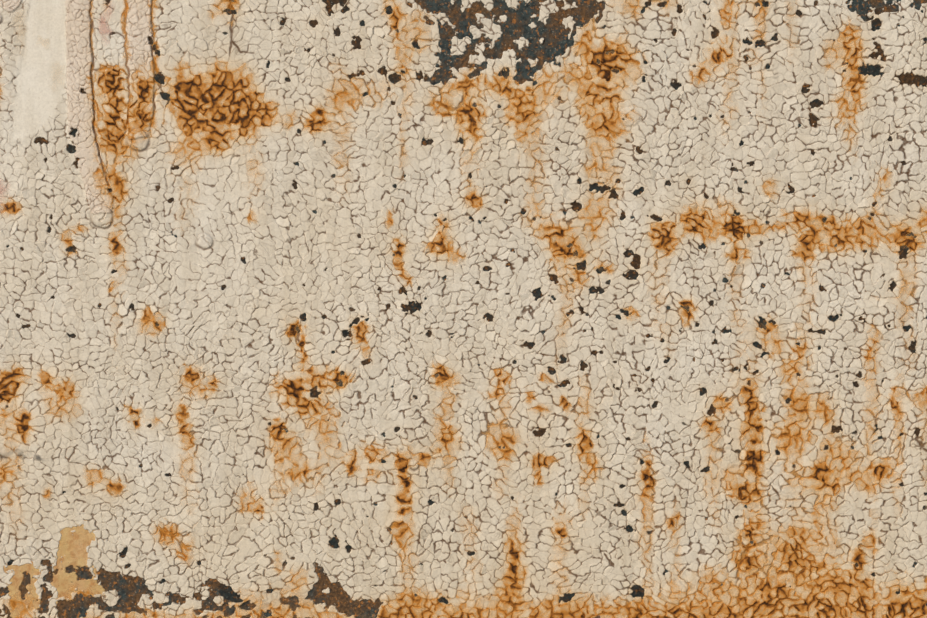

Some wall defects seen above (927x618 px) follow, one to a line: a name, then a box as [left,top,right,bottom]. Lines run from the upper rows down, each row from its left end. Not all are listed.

crack [0,33,25,93]
crack [89,0,138,187]
corrosion [87,0,277,263]
peeling [322,0,350,16]
peeling [407,0,605,86]
corrosion [430,19,640,184]
crack [526,36,583,134]
peeling [846,0,927,77]
peeling [895,72,927,87]
corrosion [649,202,927,263]
crack [568,396,590,428]
corrosion [378,322,927,618]